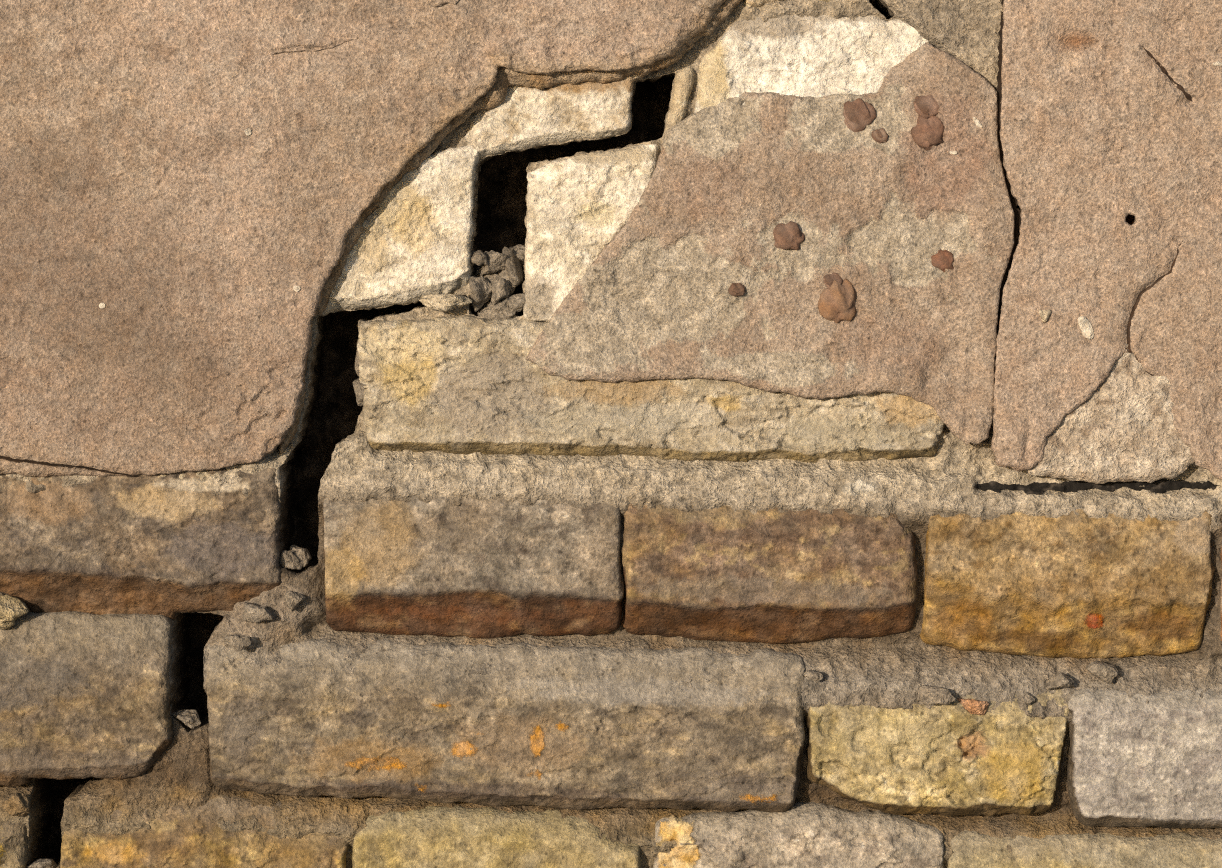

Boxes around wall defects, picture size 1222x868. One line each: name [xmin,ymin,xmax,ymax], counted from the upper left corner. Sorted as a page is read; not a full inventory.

crack [462,76,674,314]
crack [994,0,1021,383]
crack [0,455,140,477]
crack [291,302,422,561]
crack [186,612,224,714]
crack [45,778,85,854]